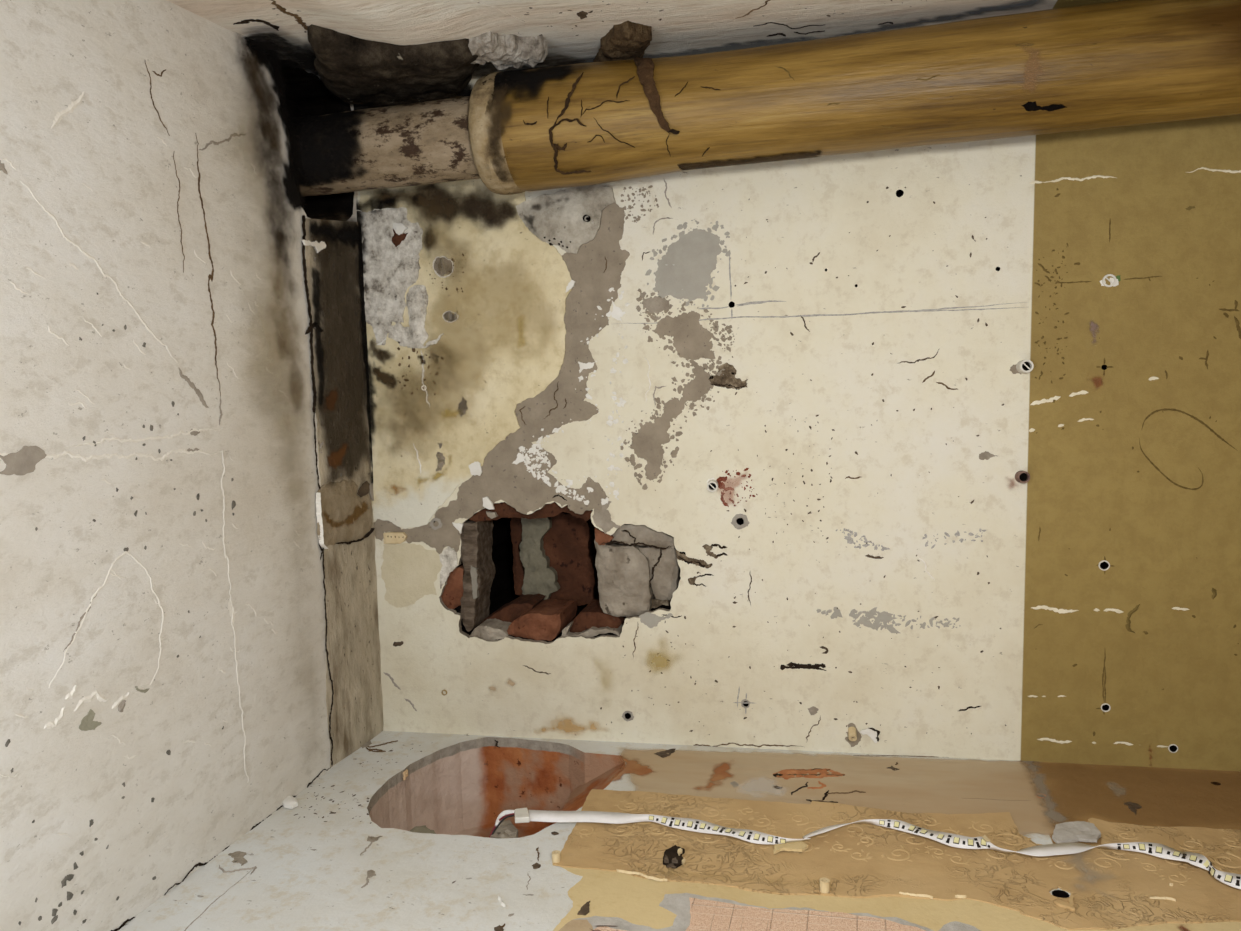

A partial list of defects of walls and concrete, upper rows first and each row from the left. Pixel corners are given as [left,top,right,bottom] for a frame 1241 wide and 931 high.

crack [302,215,322,489]
damp [397,347,452,395]
peeling [316,179,749,608]
crack [165,539,334,895]
crack [111,917,135,931]
crack [184,873,248,931]